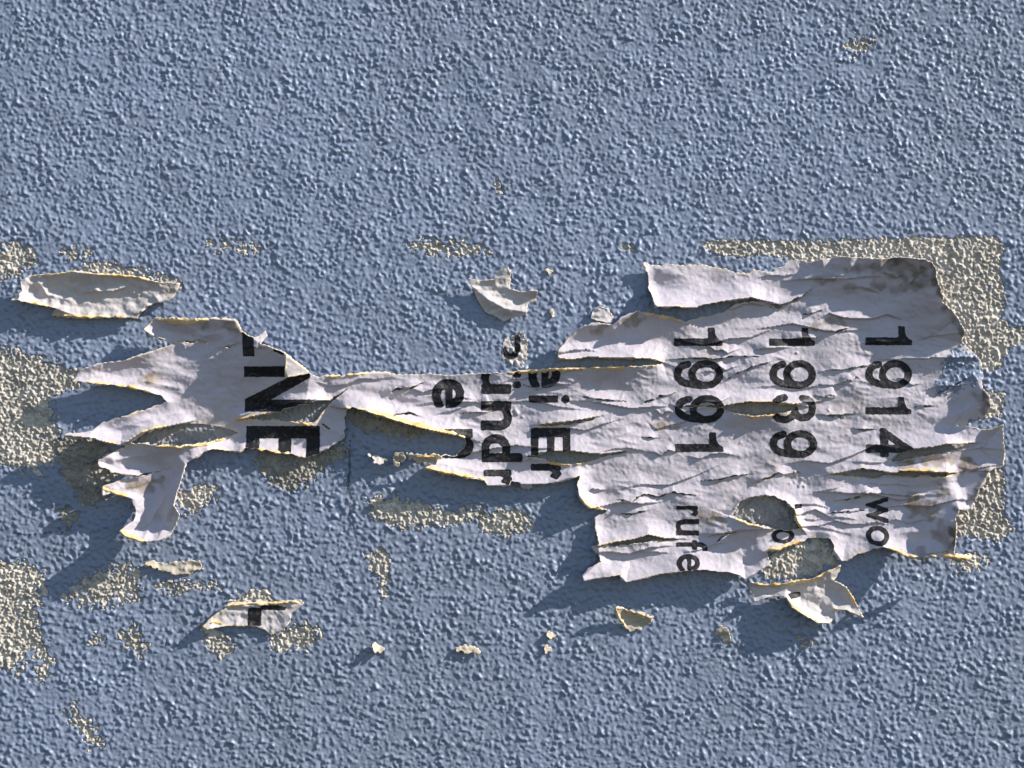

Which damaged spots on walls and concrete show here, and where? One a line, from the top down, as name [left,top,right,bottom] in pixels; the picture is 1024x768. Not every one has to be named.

flaking render [843,31,876,59]
flaking render [0,241,40,284]
flaking render [203,236,268,258]
flaking render [407,236,493,259]
flaking render [701,235,1024,371]
flaking render [0,344,118,531]
flaking render [365,491,536,538]
flaking render [363,547,392,605]
flaking render [0,559,275,685]
flaking render [265,618,322,658]
flaking render [62,701,105,753]